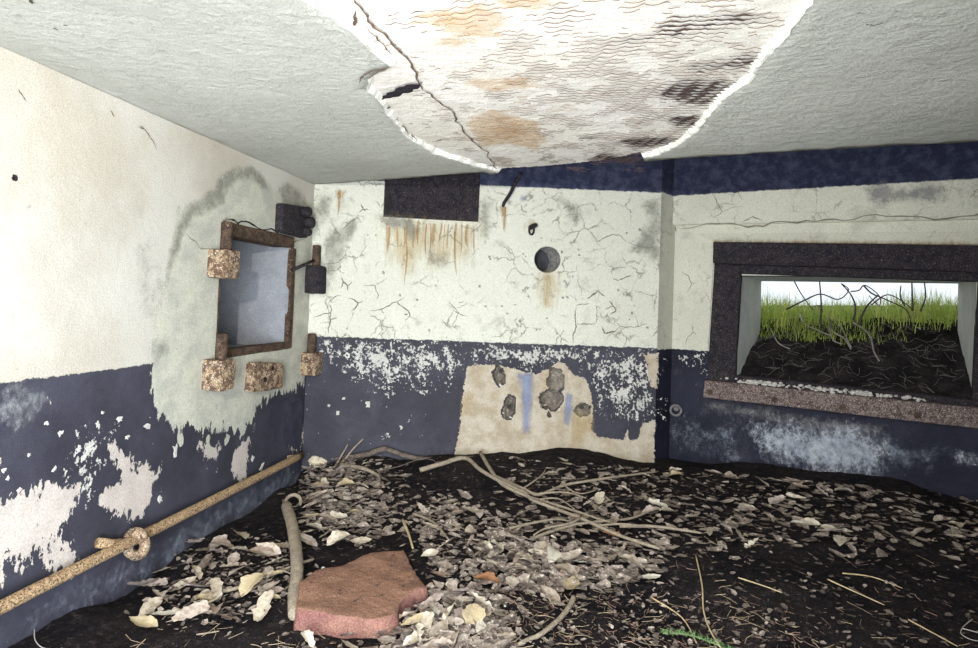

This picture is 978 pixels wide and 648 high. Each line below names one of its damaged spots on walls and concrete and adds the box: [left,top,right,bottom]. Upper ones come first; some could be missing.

crack [352,0,501,171]
damp [207,168,266,206]
crack [675,189,978,231]
crack [316,278,413,333]
crack [572,275,644,343]
flaking render [319,328,666,463]
peeling [197,440,221,473]
peeling [231,437,264,482]
damp [753,424,886,474]
peeling [0,411,162,589]